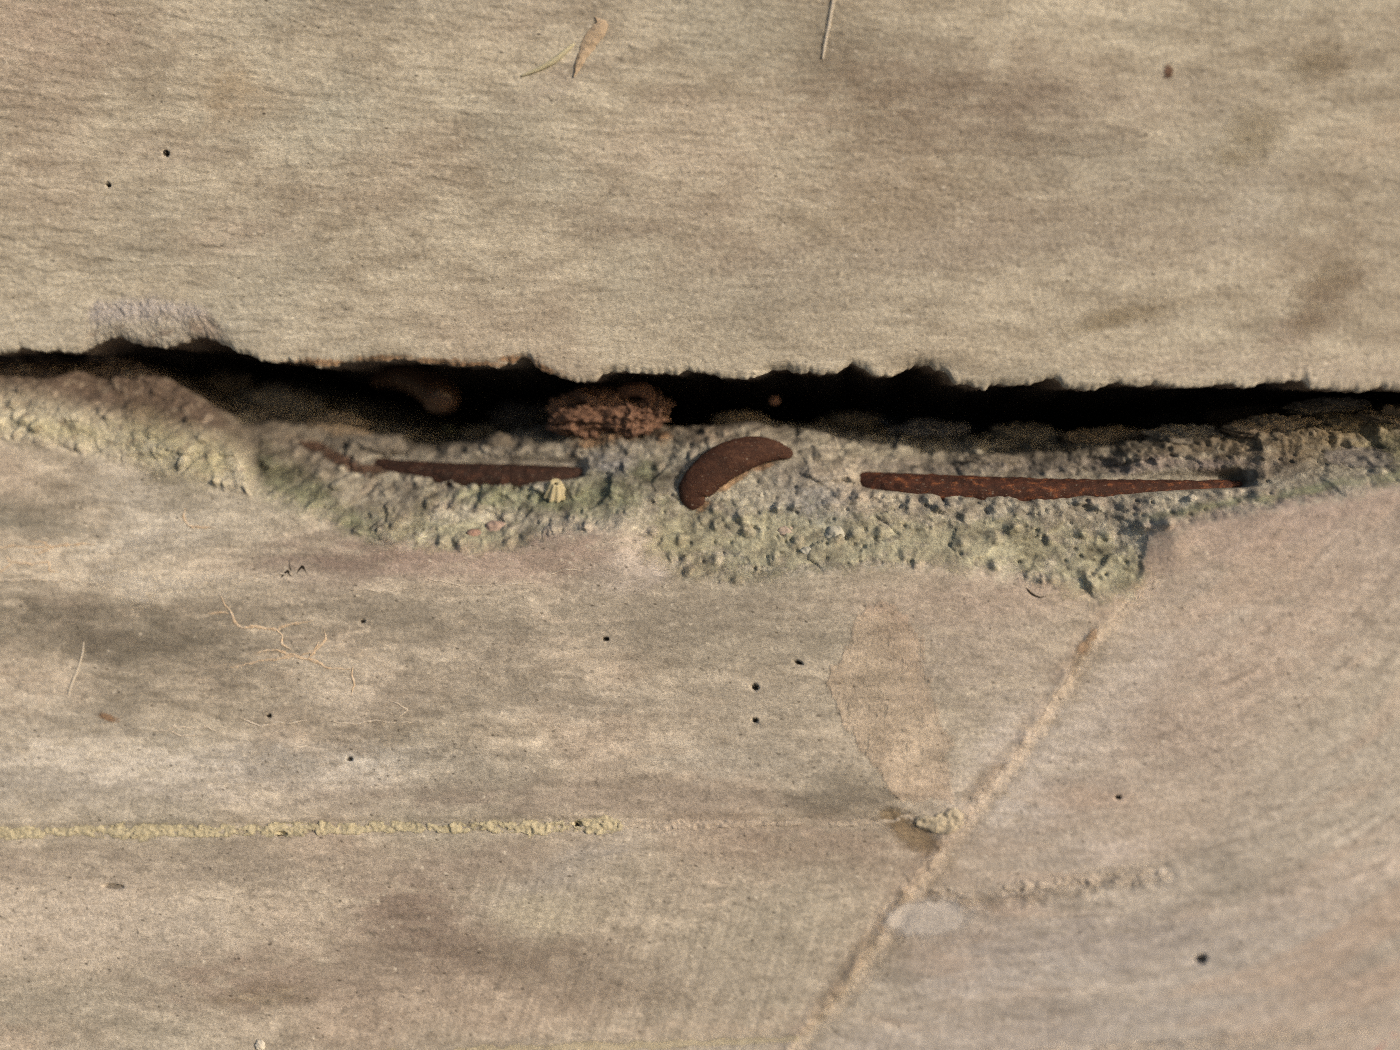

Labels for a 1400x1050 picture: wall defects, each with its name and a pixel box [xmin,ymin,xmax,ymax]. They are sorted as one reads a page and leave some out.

spalling [0,296,1400,598]
rust [697,462,774,511]